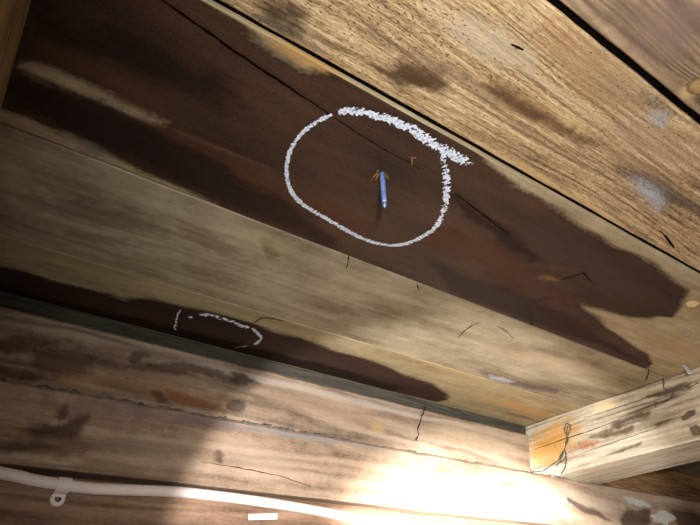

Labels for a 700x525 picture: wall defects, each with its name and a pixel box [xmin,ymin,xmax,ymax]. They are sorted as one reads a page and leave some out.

crack [162,0,420,169]
leakage [1,0,688,369]
leakage [634,172,700,211]
crack [456,194,511,236]
leakage [0,267,448,401]
crack [530,368,688,451]
leakage [598,412,649,438]
leakage [647,383,690,397]
crack [202,462,310,486]